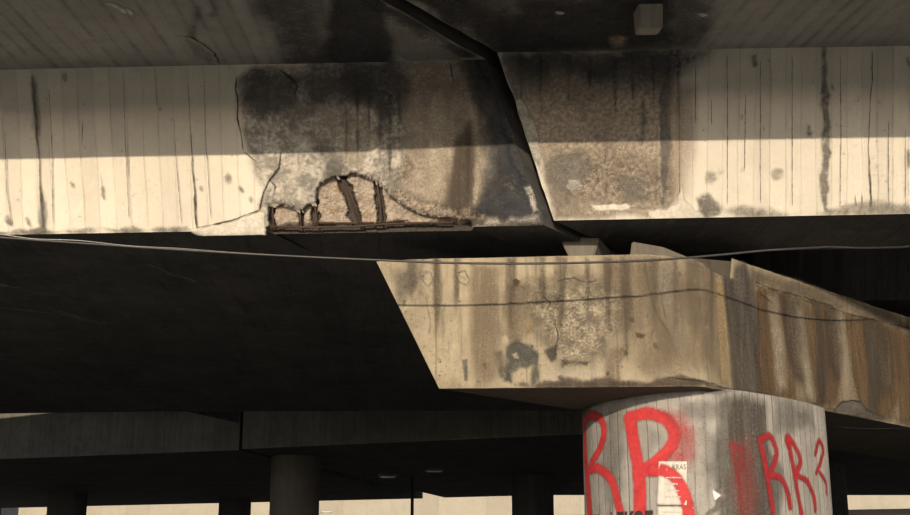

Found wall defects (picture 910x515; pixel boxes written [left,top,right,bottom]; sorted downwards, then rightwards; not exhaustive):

water stain [419,0,710,52]
crack [123,142,131,214]
crack [175,112,281,228]
peeling [235,61,533,234]
water stain [255,0,544,225]
water stain [657,85,671,204]
water stain [462,267,499,381]
peeling [520,273,733,390]